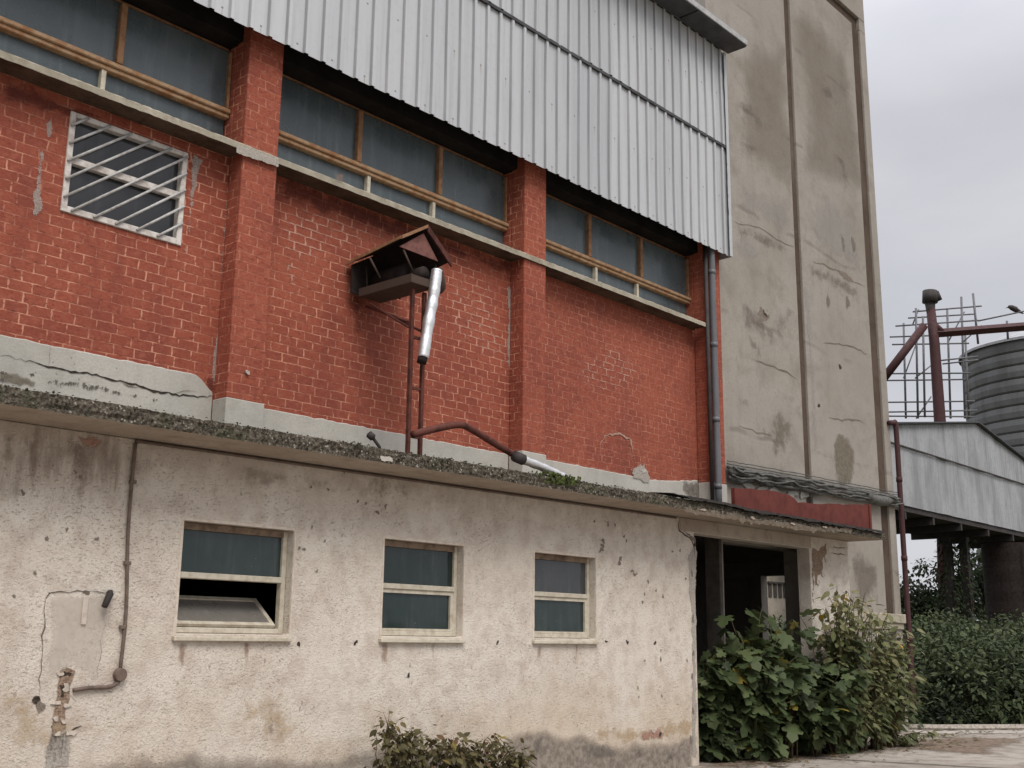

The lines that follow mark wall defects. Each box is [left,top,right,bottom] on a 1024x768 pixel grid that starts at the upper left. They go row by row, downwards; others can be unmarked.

peeling [33,187,43,215]
crack [815,262,861,290]
crack [2,347,214,398]
spalling [631,464,650,483]
damp [835,434,853,485]
crack [39,590,107,695]
spalling [36,668,81,768]